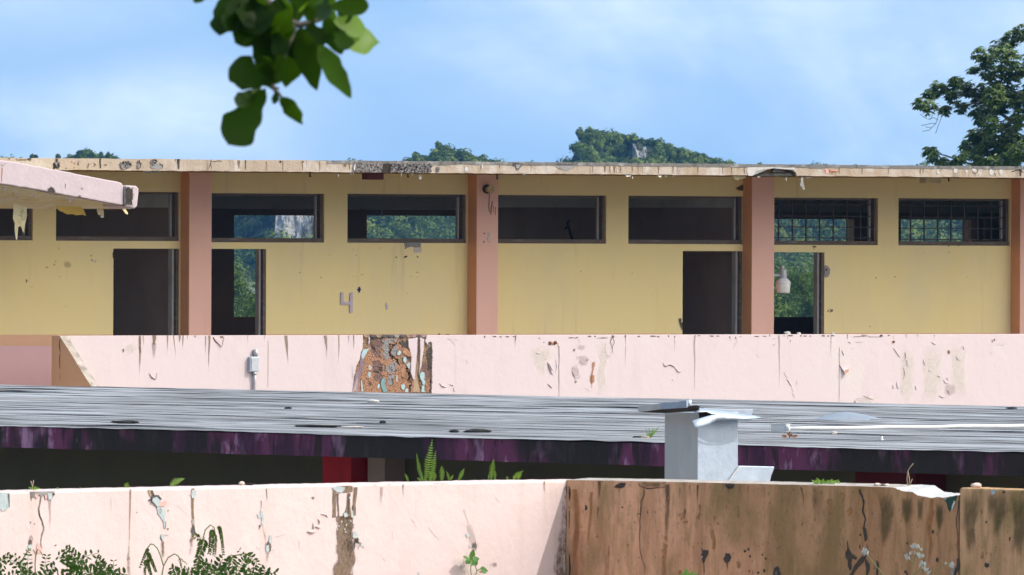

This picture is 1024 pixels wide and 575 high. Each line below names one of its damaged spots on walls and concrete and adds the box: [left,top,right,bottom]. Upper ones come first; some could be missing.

spalling [338,162,440,179]
peeling [2,187,37,240]
water stain [139,335,184,361]
spalling [352,335,454,392]
peeling [148,490,169,555]
peeling [332,486,364,547]
water stain [662,484,670,553]